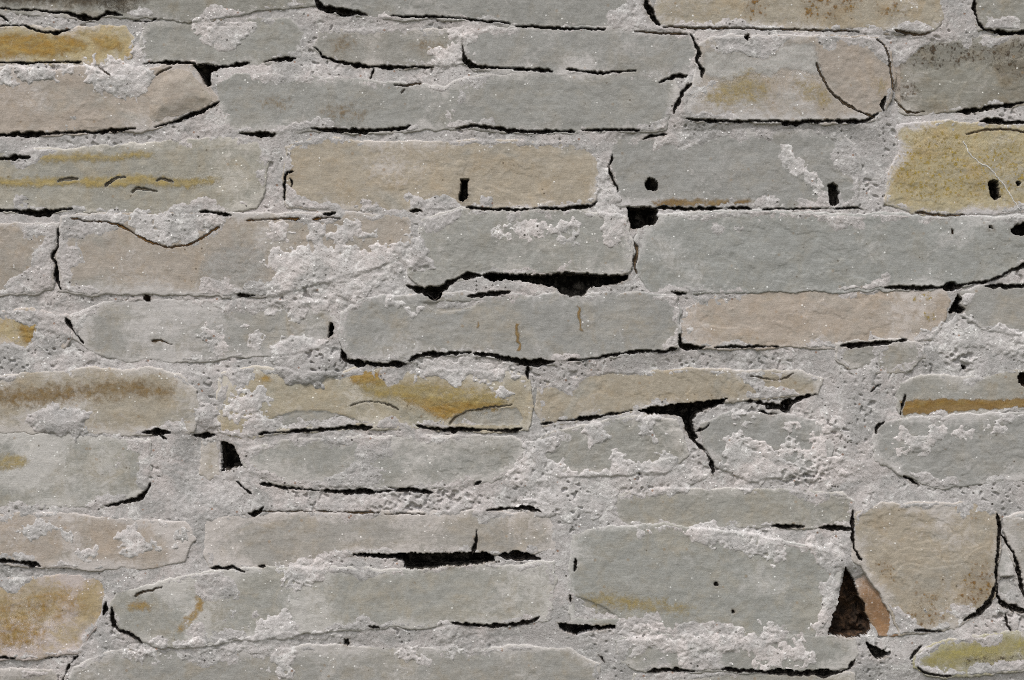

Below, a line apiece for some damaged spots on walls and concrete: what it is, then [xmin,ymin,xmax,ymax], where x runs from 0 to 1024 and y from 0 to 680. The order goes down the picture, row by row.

crack [816,63,886,117]
crack [51,218,219,290]
crack [688,424,715,474]